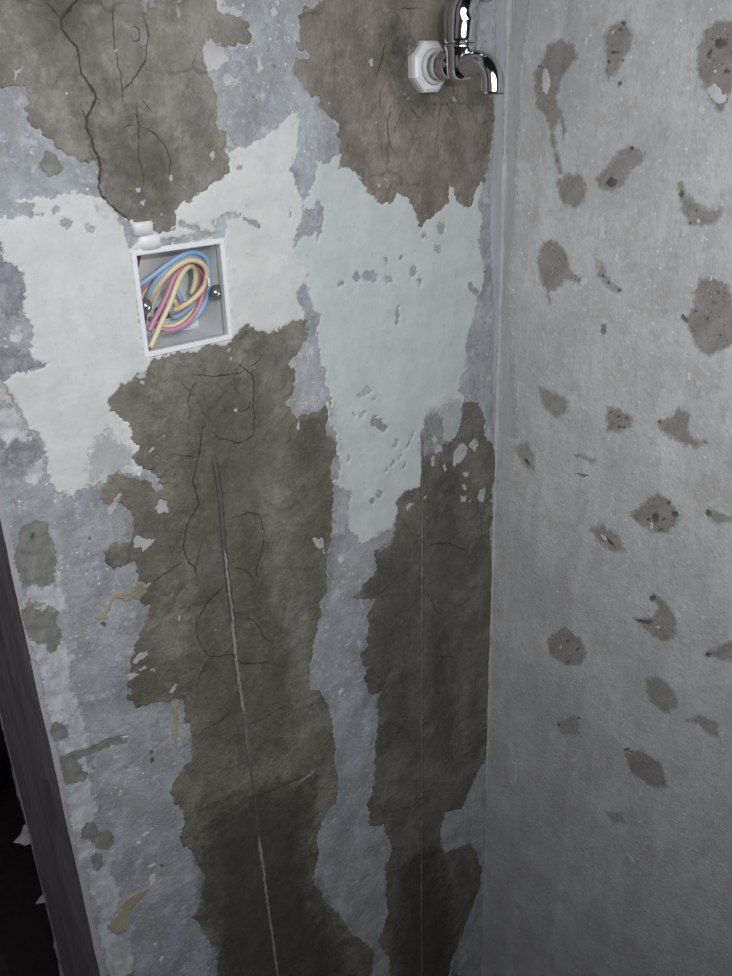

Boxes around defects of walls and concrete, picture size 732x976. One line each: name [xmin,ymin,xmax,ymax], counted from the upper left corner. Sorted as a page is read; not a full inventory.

crack [44,0,125,217]
peeling [0,0,275,234]
crack [113,10,171,182]
water stain [536,40,576,144]
water stain [698,21,732,110]
water stain [538,240,588,302]
water stain [682,275,732,355]
water stain [633,494,678,532]
crack [153,360,281,976]
peeling [95,319,495,976]
peeling [14,824,31,846]
water stain [205,789,344,976]